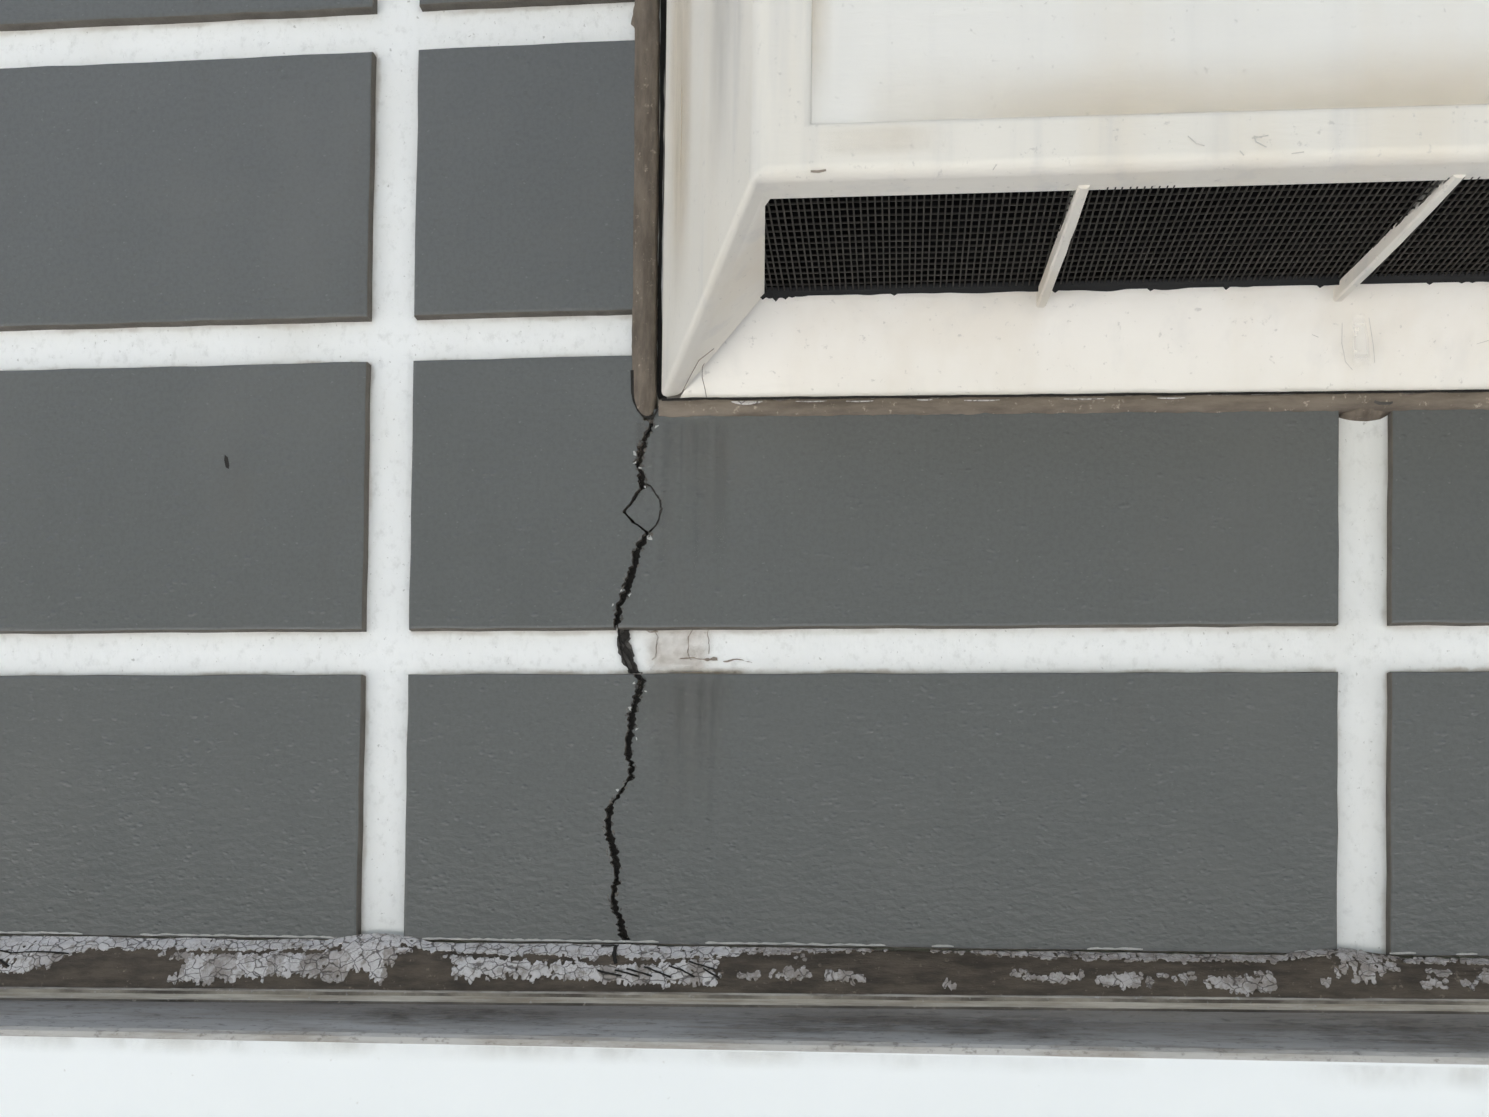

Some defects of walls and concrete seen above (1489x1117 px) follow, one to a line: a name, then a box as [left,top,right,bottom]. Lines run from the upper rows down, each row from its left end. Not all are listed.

crack [597,421,752,979]
peeling [0,933,895,989]
peeling [929,948,1489,997]